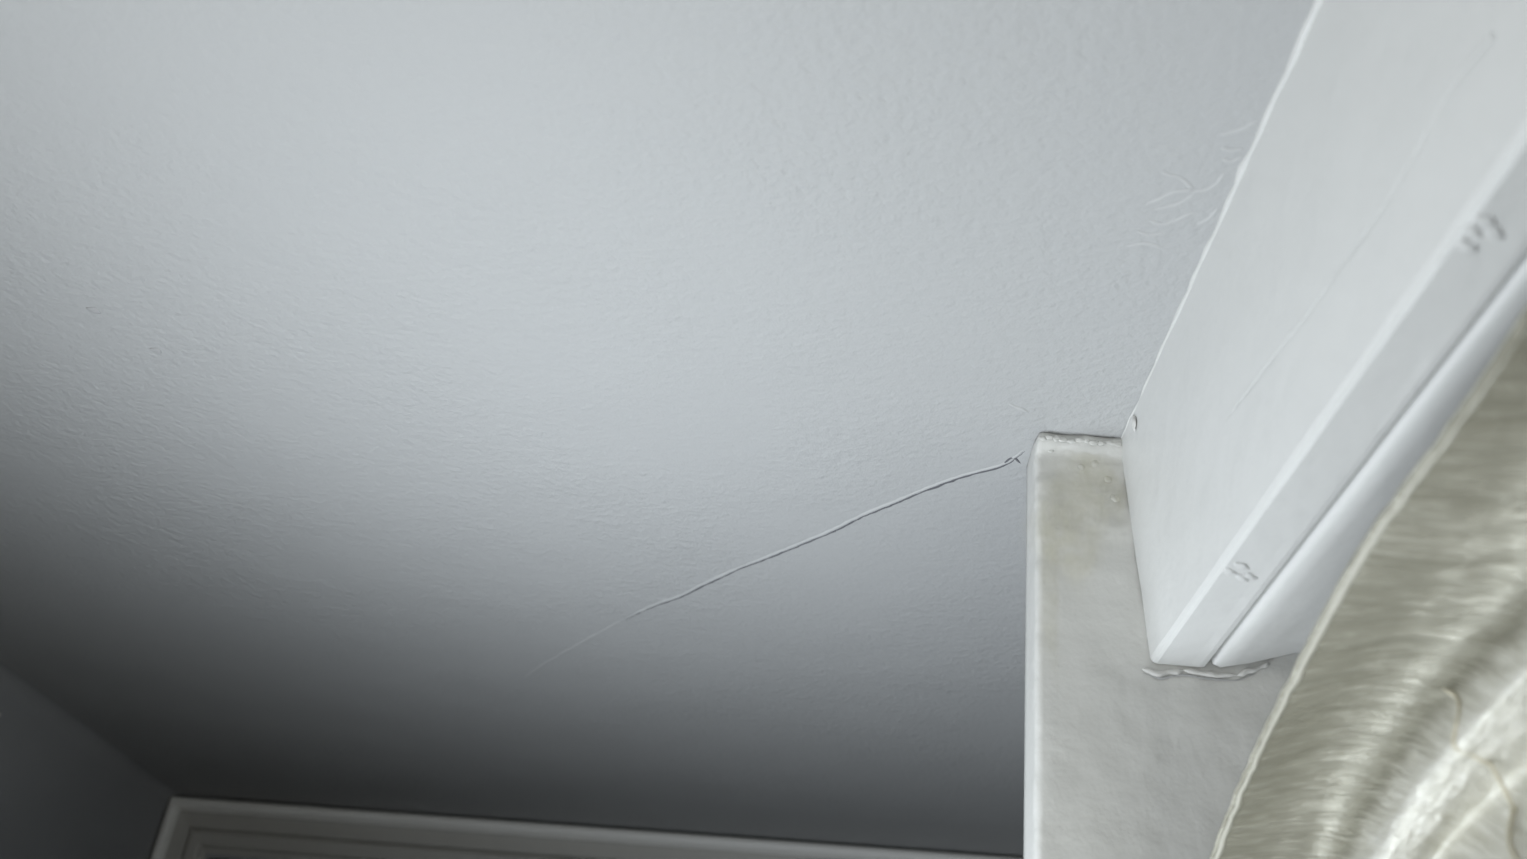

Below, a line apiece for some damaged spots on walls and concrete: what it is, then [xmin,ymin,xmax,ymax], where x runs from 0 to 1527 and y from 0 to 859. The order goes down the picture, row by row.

crack [525,450,1025,677]